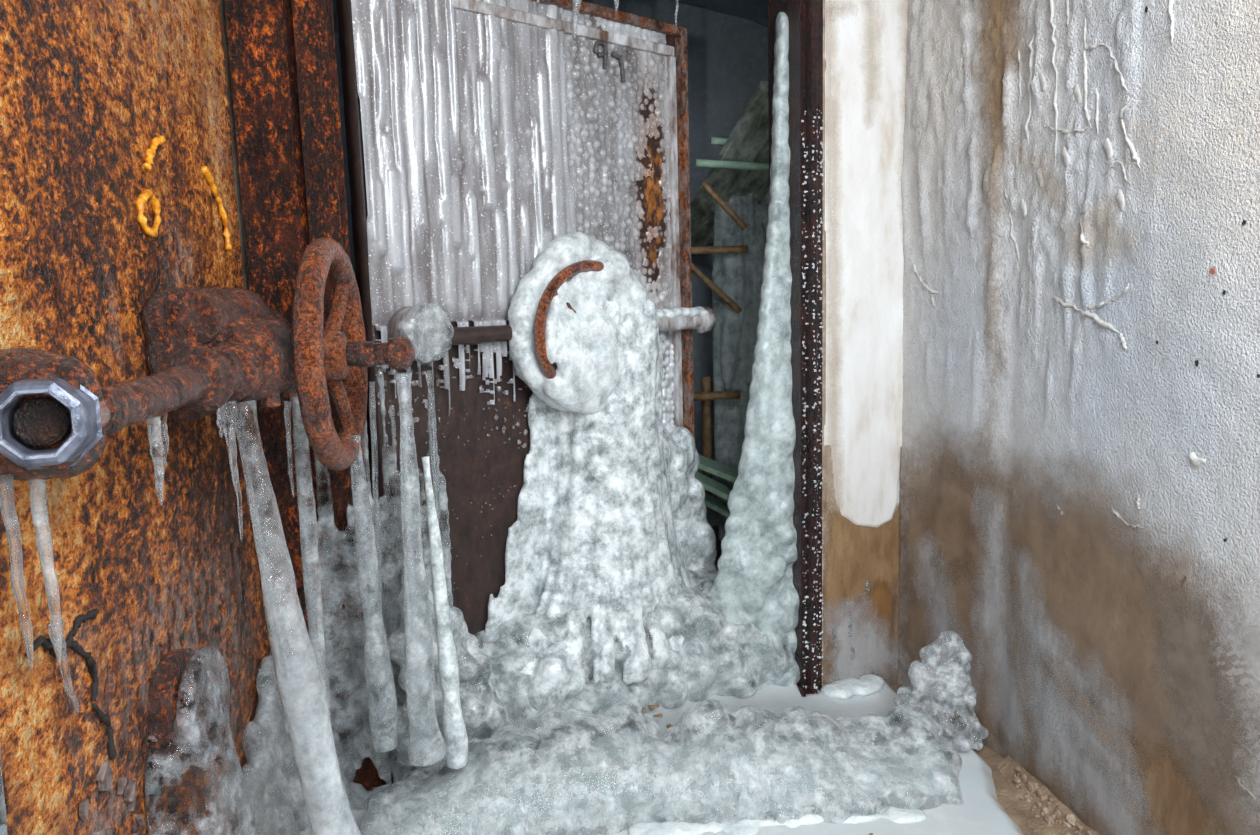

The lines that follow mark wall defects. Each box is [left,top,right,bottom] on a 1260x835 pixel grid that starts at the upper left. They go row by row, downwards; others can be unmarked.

crack [24,609,117,760]
damp [823,447,1249,835]
rust [79,761,147,835]